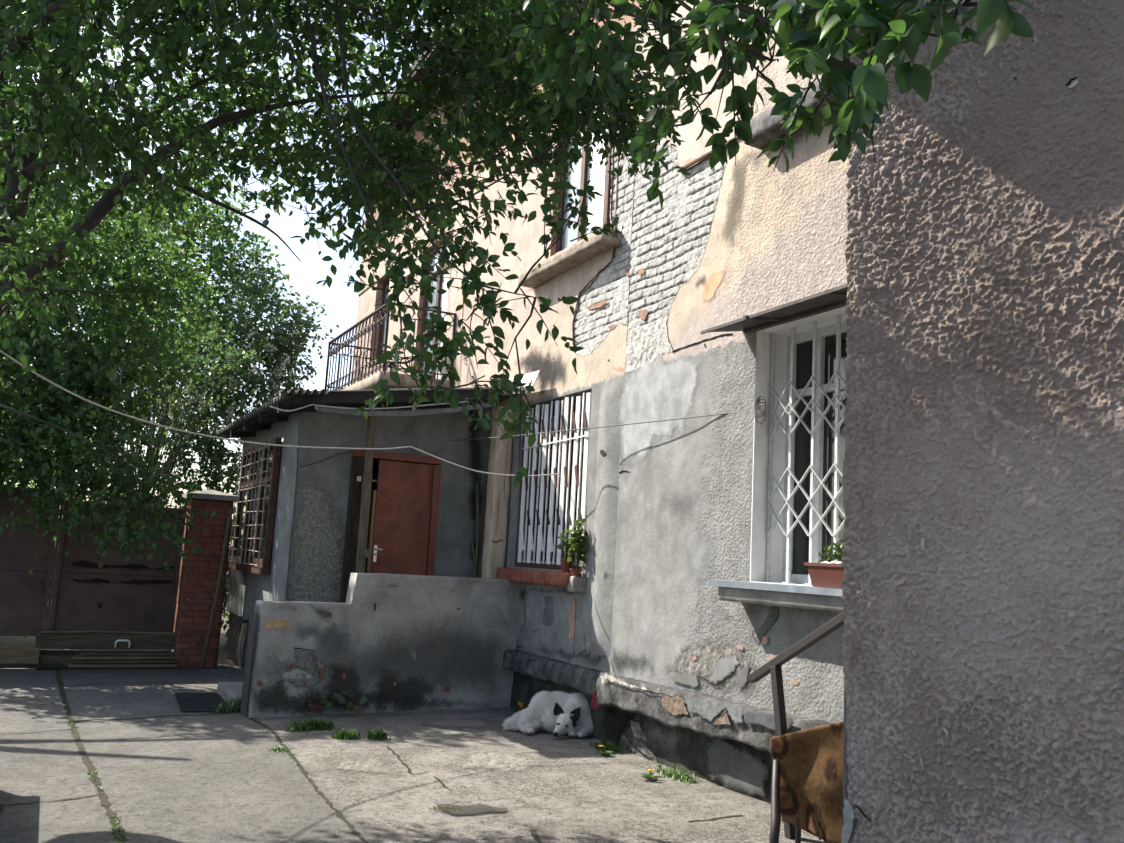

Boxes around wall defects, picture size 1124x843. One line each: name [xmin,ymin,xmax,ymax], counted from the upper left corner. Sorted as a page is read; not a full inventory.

flaking render [572,120,728,372]
flaking render [287,647,325,687]
water stain [240,603,491,717]
spalling [662,696,688,715]
spalling [711,709,731,725]
flaking render [669,606,779,694]